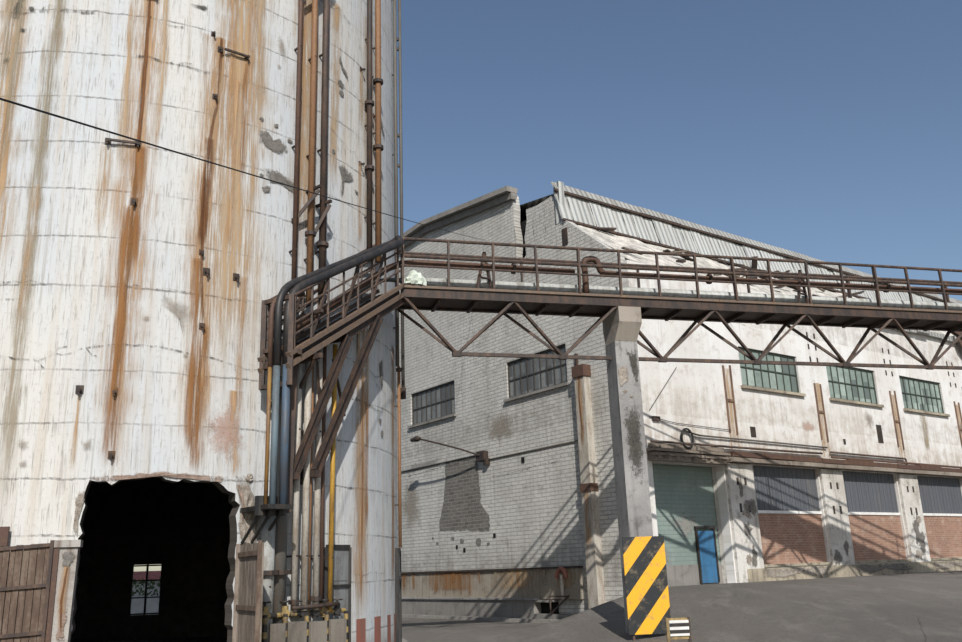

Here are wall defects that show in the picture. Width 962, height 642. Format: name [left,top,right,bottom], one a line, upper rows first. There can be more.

spalling [259,117,293,153]
corrosion [0,0,63,447]
corrosion [100,0,168,447]
corrosion [185,0,265,470]
spalling [260,169,294,193]
corrosion [355,329,368,589]
peeling [411,456,490,547]
corrosion [433,572,480,593]
spalling [857,515,962,575]